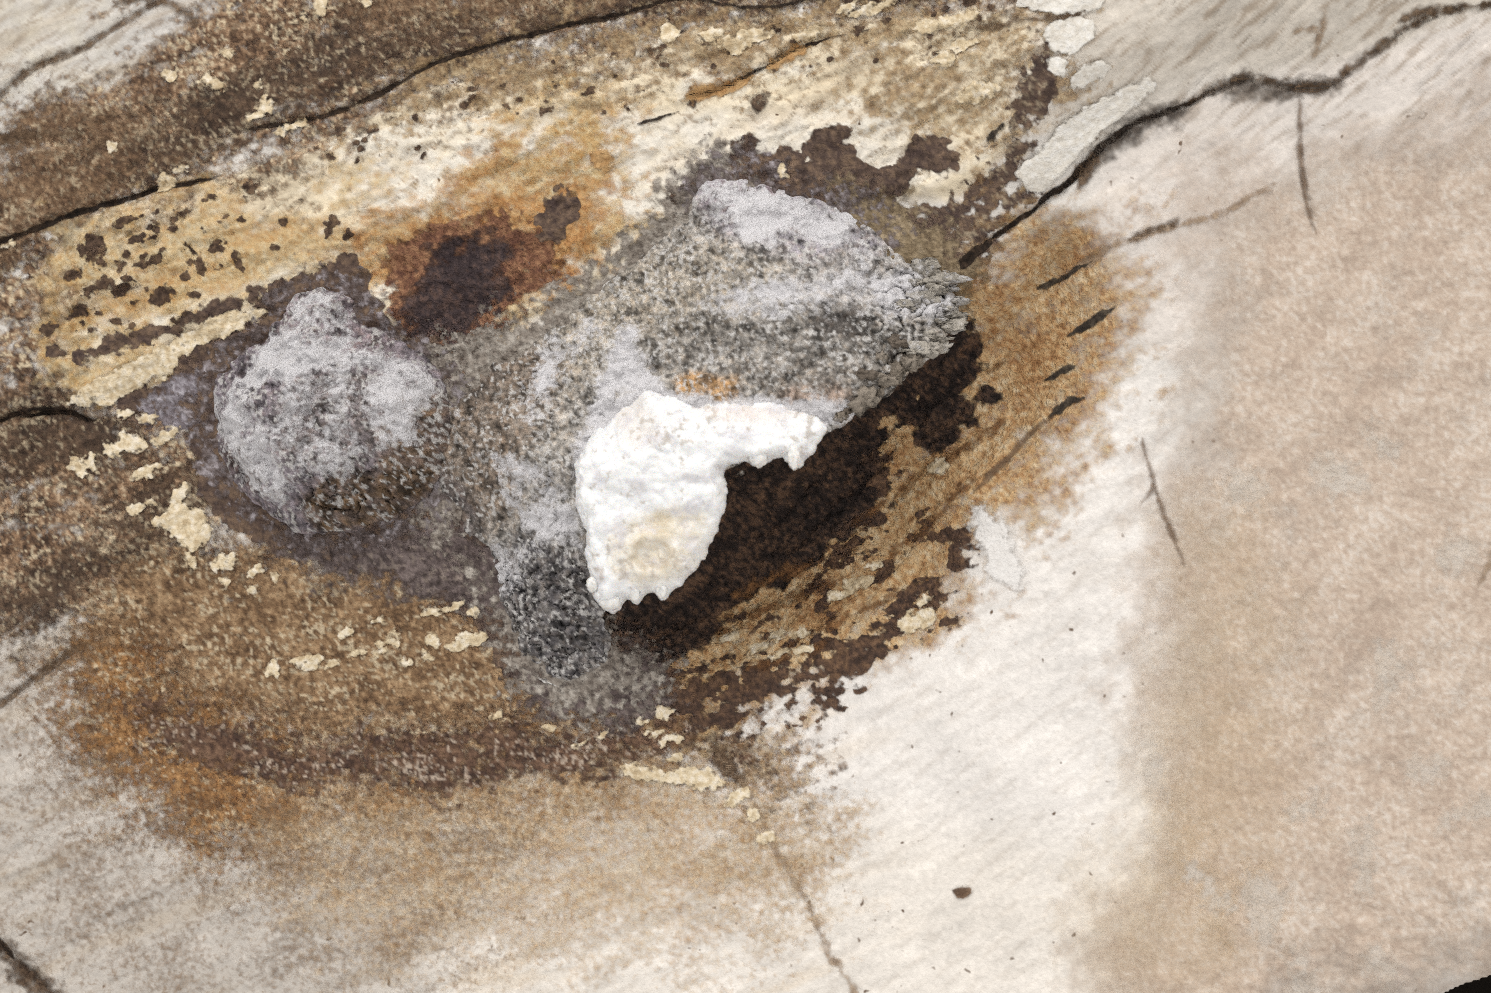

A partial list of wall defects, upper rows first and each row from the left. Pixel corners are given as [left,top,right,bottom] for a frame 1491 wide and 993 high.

peeling [246,79,307,137]
crack [217,0,805,137]
crack [637,34,845,125]
crack [959,1,1491,277]
crack [0,176,217,251]
corrosion [35,80,647,390]
water stain [0,0,1091,860]
corrosion [596,208,1157,769]
peeling [897,594,936,634]
peeling [968,506,1027,590]
spalling [977,396,1085,488]
corrosion [35,635,814,971]